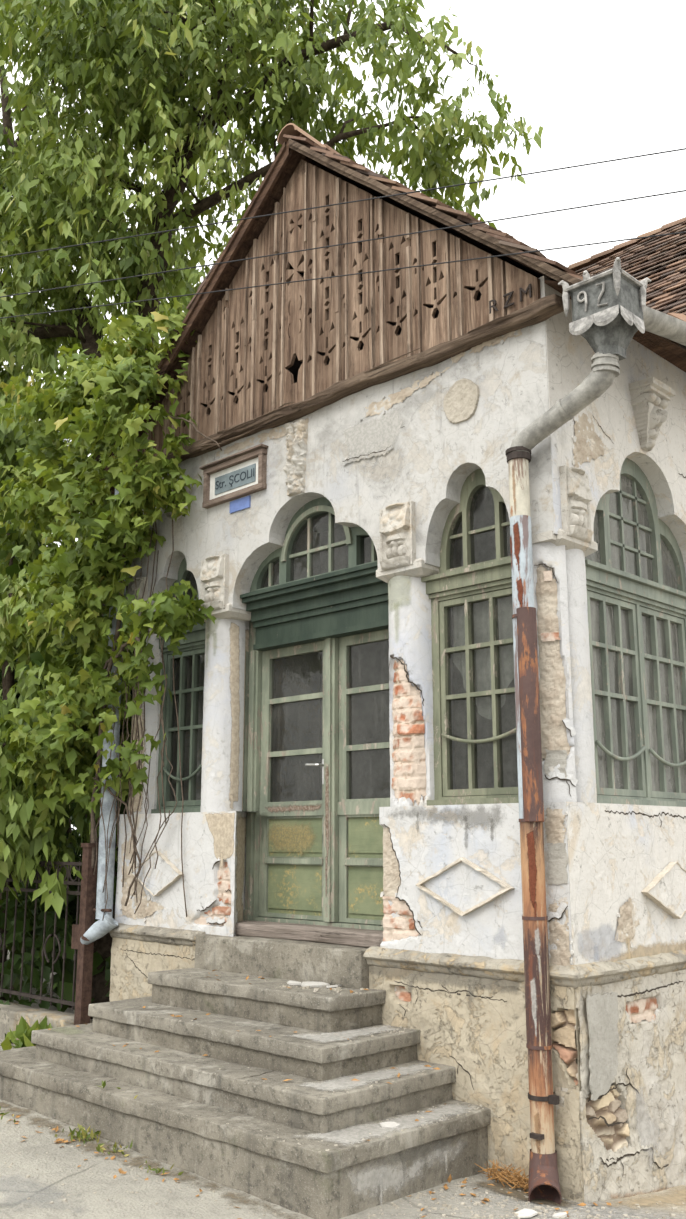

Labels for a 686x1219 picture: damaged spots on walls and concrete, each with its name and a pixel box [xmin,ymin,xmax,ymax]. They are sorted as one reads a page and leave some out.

flaking render [534,563,572,761]
flaking render [388,655,427,806]
peeling [194,623,249,926]
flaking render [380,827,421,942]
corrosion [527,831,537,917]
crack [395,981,509,1019]
crack [448,1049,478,1090]
flaking render [551,1009,581,1086]
flaking render [626,996,659,1023]
flaking render [586,1085,630,1152]